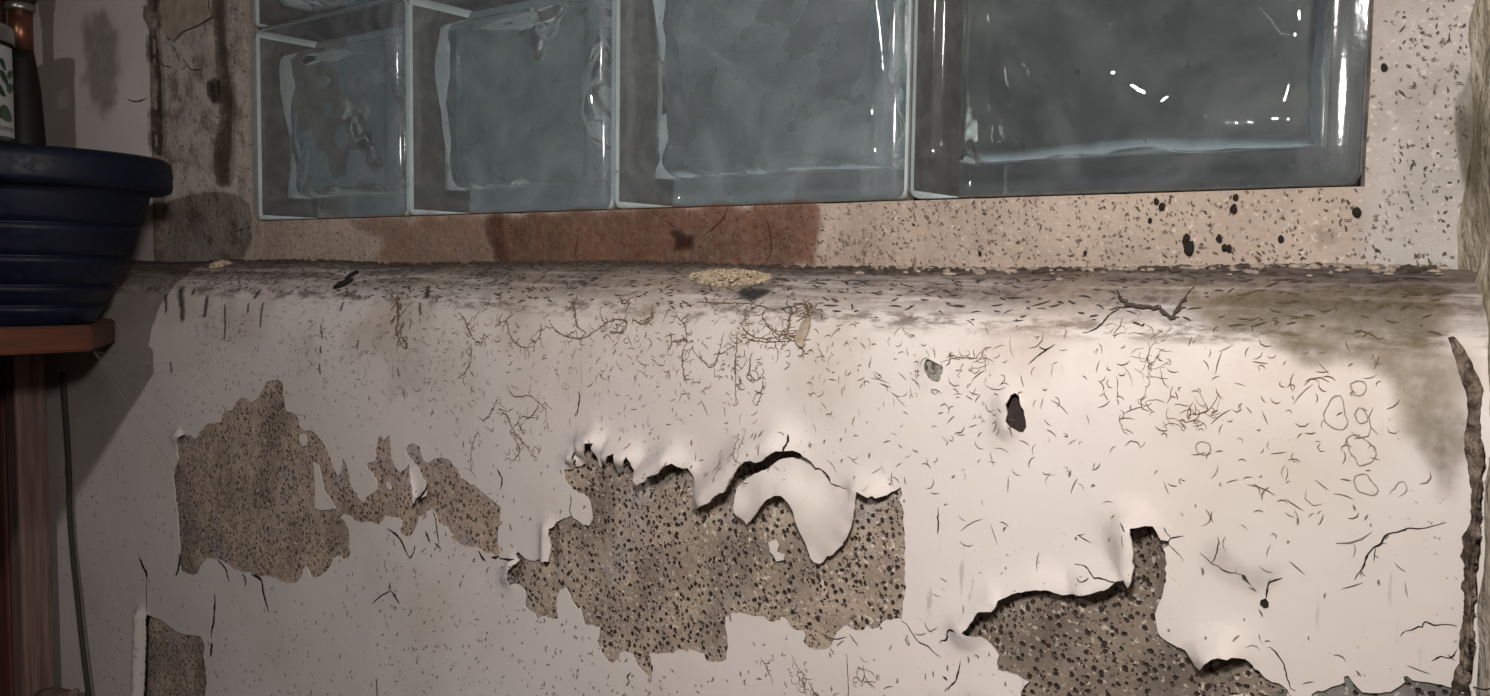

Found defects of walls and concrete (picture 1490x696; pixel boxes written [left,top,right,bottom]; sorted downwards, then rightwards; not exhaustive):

peeling [146,616,207,696]
peeling [174,380,906,677]
peeling [962,526,1288,696]
peeling [1312,676,1452,696]
crack [1354,336,1490,696]